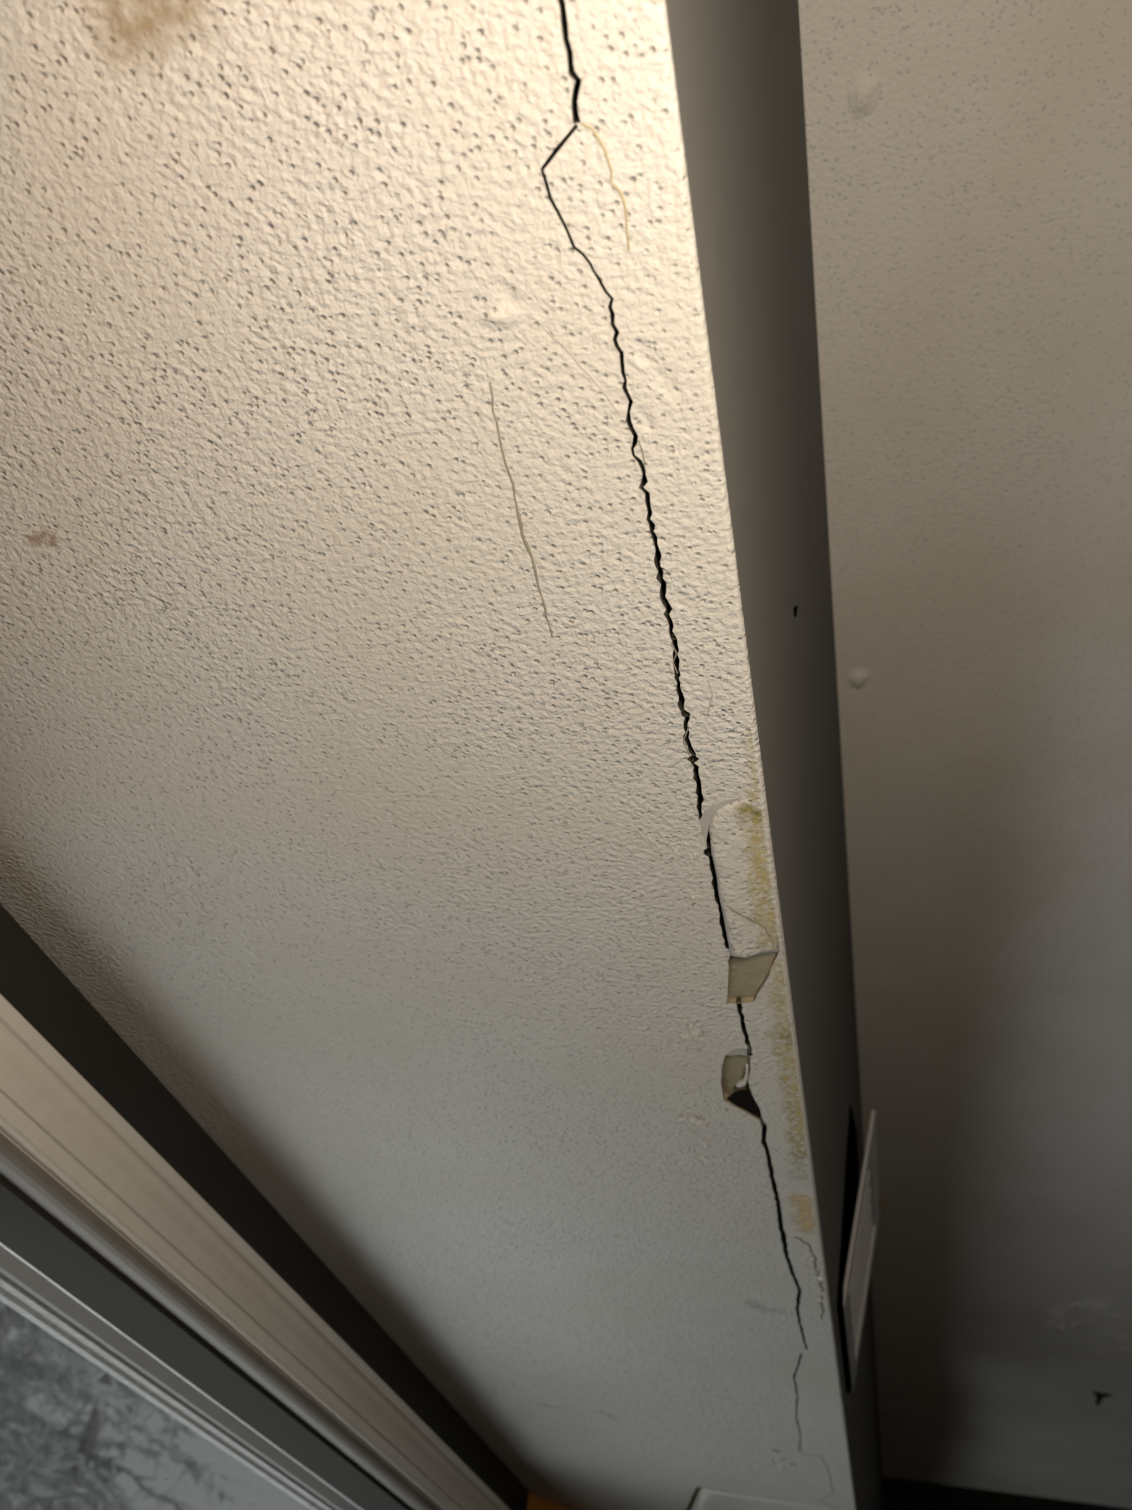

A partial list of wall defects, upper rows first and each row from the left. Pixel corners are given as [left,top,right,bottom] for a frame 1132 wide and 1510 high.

crack [489,382,553,638]
crack [540,0,730,949]
spalling [726,952,779,1004]
crack [736,997,753,1056]
spalling [721,1041,766,1126]
crack [760,1119,839,1510]
crack [686,1487,701,1510]